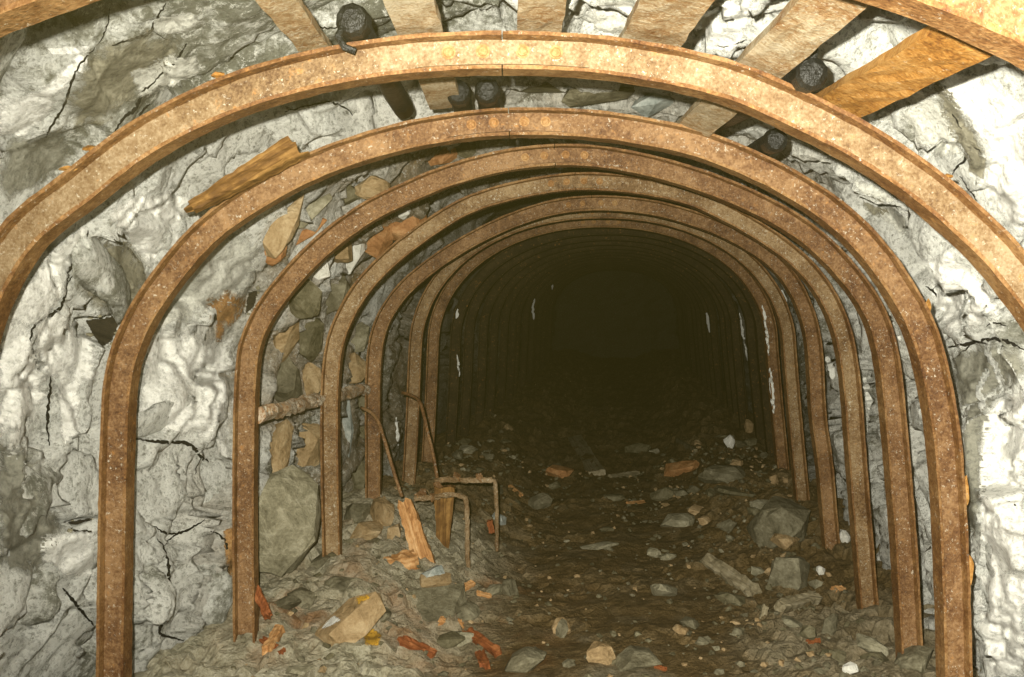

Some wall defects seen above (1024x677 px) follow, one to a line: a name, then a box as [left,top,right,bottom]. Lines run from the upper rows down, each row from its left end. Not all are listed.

crack [46,3,187,137]
rust [932,84,986,178]
rust [864,197,889,217]
rust [208,291,246,342]
crack [29,263,73,446]
crack [136,438,209,474]
crack [154,519,230,582]
crack [158,624,184,641]